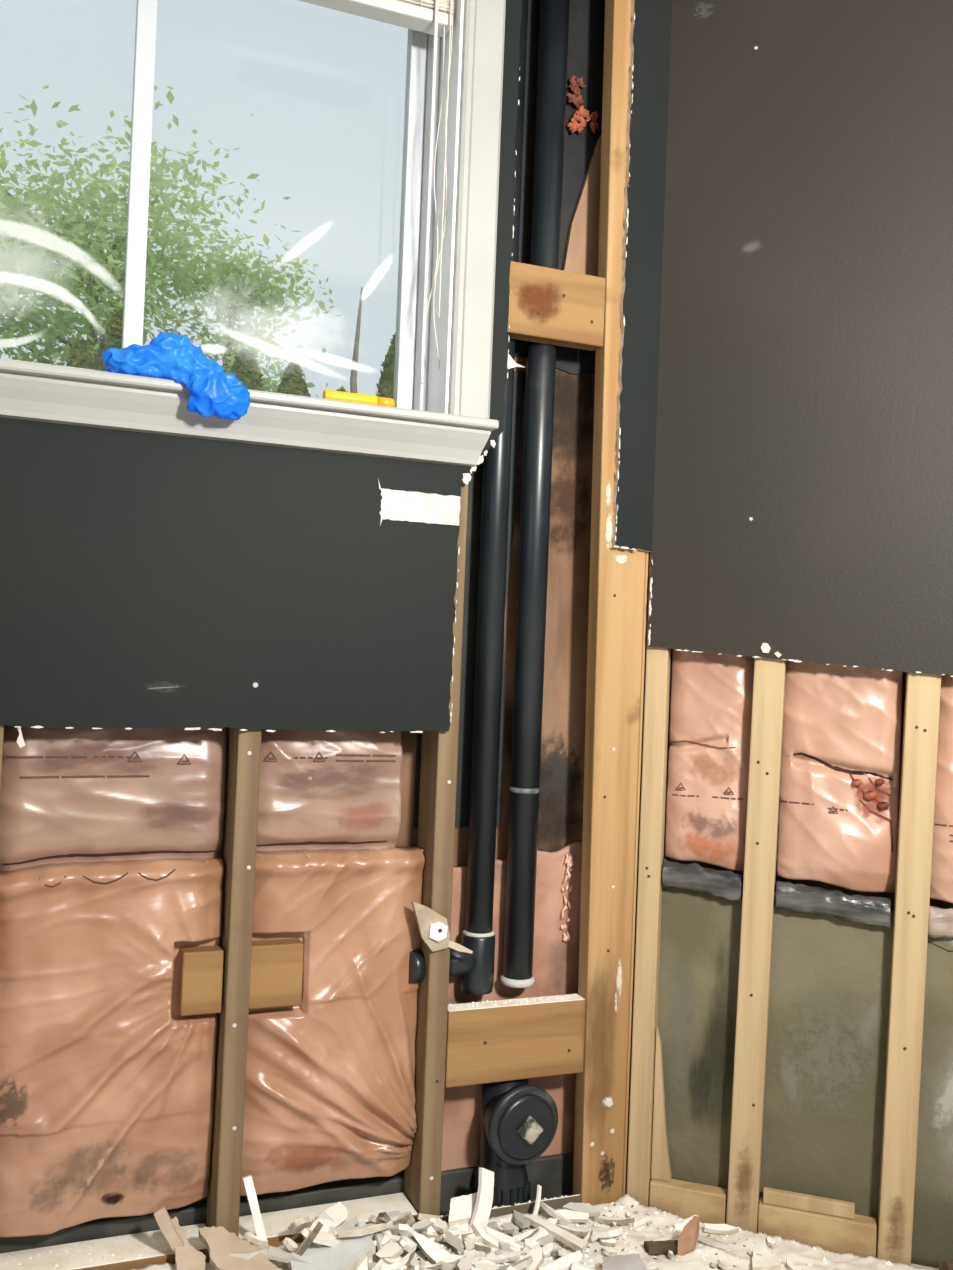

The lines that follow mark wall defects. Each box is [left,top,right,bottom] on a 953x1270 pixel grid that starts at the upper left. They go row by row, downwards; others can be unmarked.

damp [553,370,595,456]
damp [550,478,588,549]
damp [545,596,557,669]
damp [537,738,580,852]
damp [693,1011,730,1112]
damp [935,1059,953,1162]
damp [739,1164,750,1209]